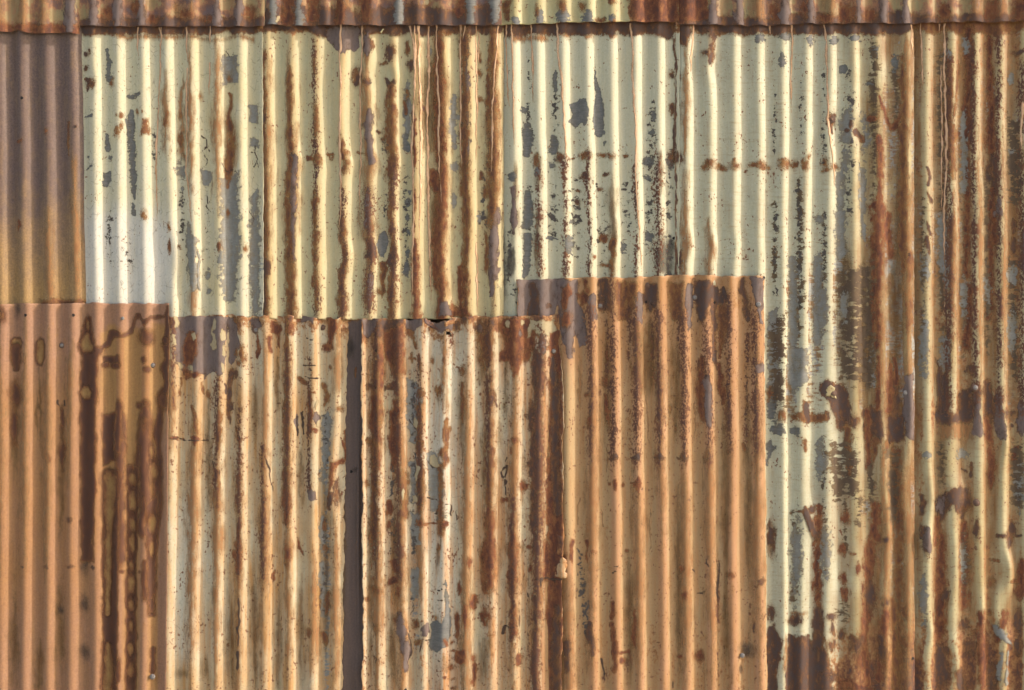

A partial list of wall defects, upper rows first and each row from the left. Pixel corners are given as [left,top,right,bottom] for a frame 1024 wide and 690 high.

peeling [125,91,140,216]
peeling [172,159,263,380]
peeling [476,70,675,363]
rust [0,337,28,520]
rust [35,305,247,690]
peeling [388,370,448,556]
rust [442,382,492,690]
rust [472,141,778,690]
peeling [787,503,804,611]
rust [763,134,914,690]
peeling [814,435,904,581]
rust [922,485,1024,690]